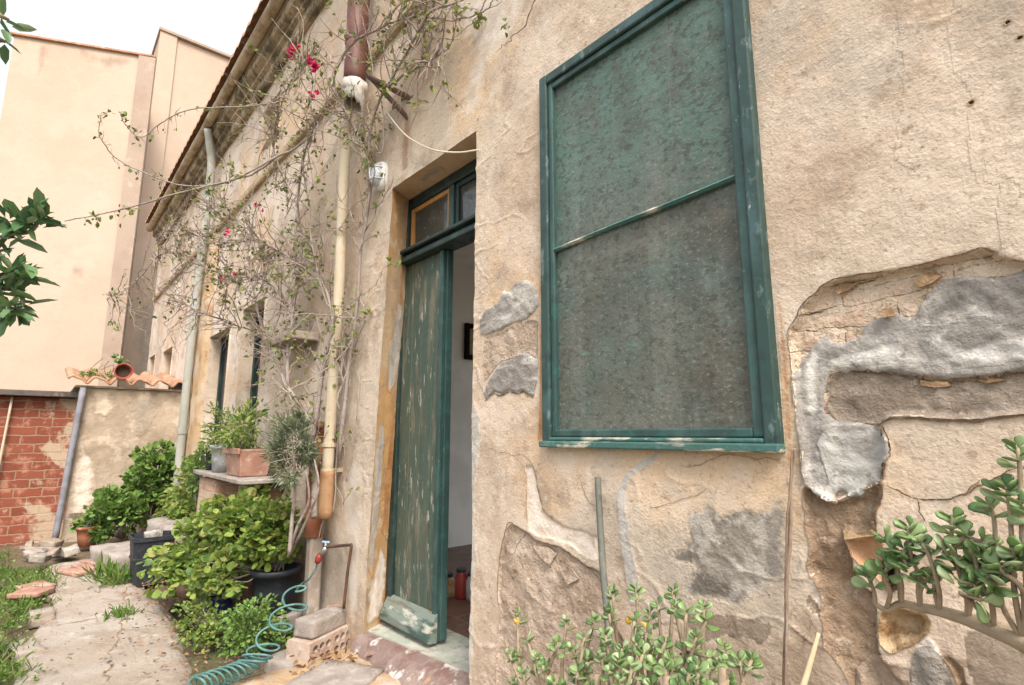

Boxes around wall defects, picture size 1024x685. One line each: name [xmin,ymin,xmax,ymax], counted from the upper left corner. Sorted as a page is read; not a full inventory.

flaking render [483,320,538,380]
flaking render [788,249,1024,422]
flaking render [824,369,1024,433]
flaking render [496,524,628,685]
flaking render [801,451,967,685]